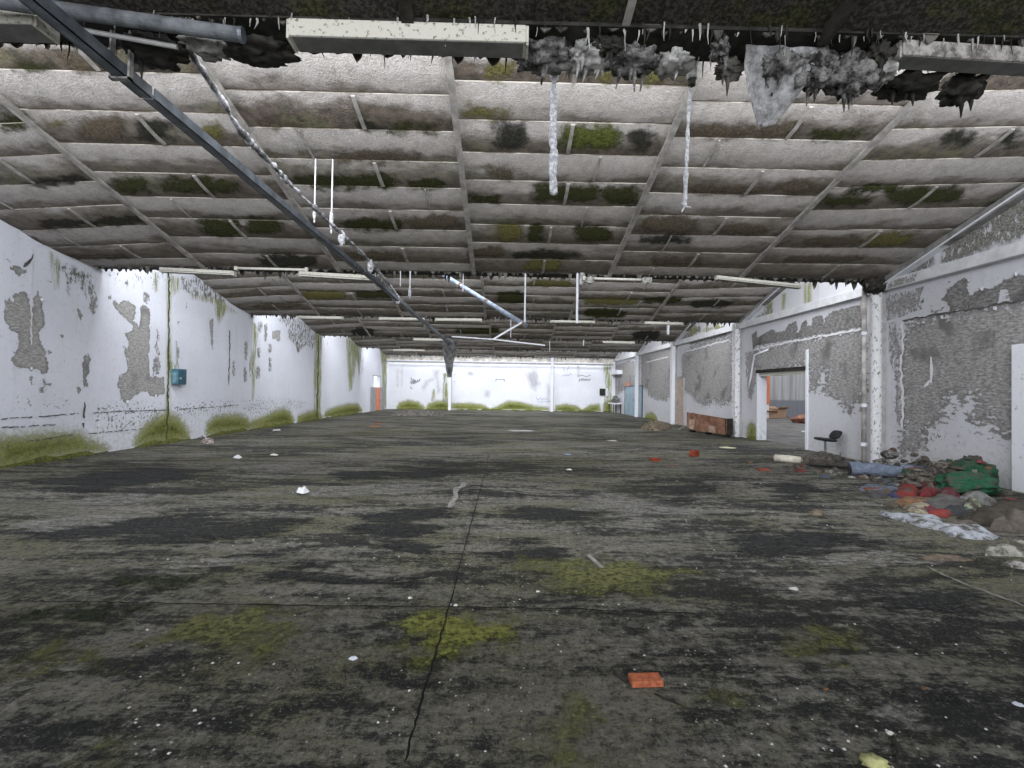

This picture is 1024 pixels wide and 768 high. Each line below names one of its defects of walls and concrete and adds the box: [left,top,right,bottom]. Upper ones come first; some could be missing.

mould [491,120,529,150]
mould [626,126,658,153]
damp [159,175,239,195]
damp [467,193,500,205]
damp [601,185,639,205]
damp [468,245,580,260]
peeling [4,291,91,408]
peeling [77,284,165,429]
peeling [616,326,732,408]
peeling [745,303,870,417]
peeling [885,261,1024,462]
crack [0,456,700,763]